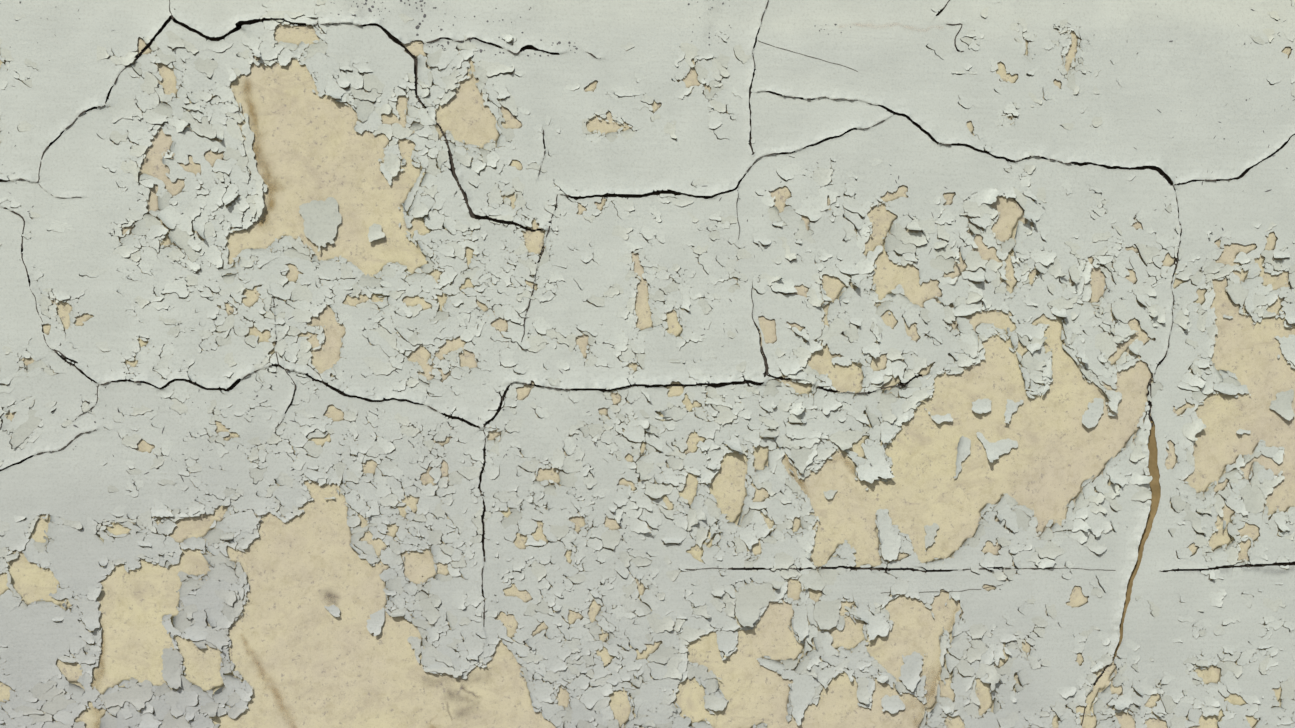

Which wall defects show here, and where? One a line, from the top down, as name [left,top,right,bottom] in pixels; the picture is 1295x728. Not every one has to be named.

crack [0,0,608,200]
peeling [550,177,635,222]
peeling [652,188,694,207]
peeling [0,267,110,450]
peeling [120,328,175,382]
peeling [755,312,777,347]
crack [436,0,1295,686]
peeling [103,405,173,474]
peeling [183,400,244,458]
crack [0,201,922,624]
peeling [1062,561,1110,608]
peeling [996,595,1295,728]